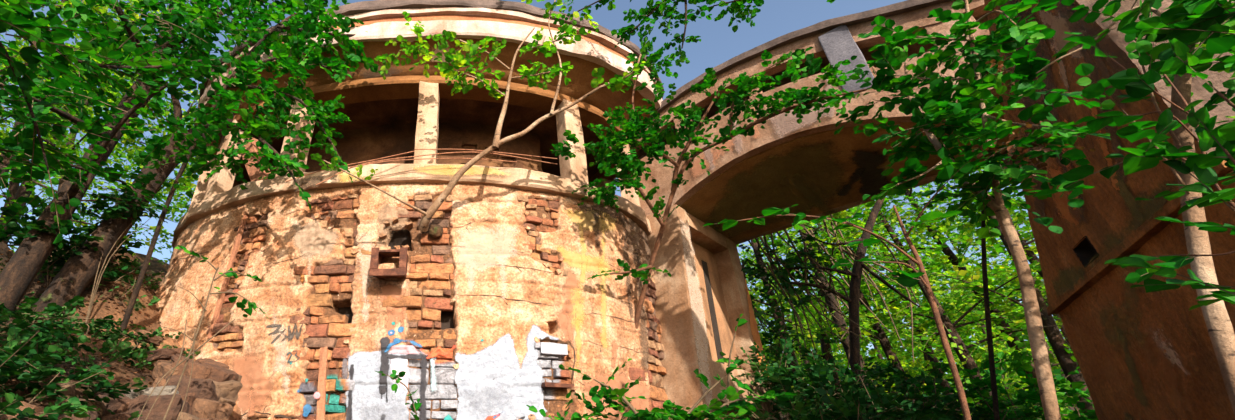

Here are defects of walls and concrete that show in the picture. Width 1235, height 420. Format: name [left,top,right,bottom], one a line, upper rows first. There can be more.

spalling [206,211,269,353]
spalling [241,194,474,420]
spalling [516,195,580,420]
spalling [628,278,670,419]